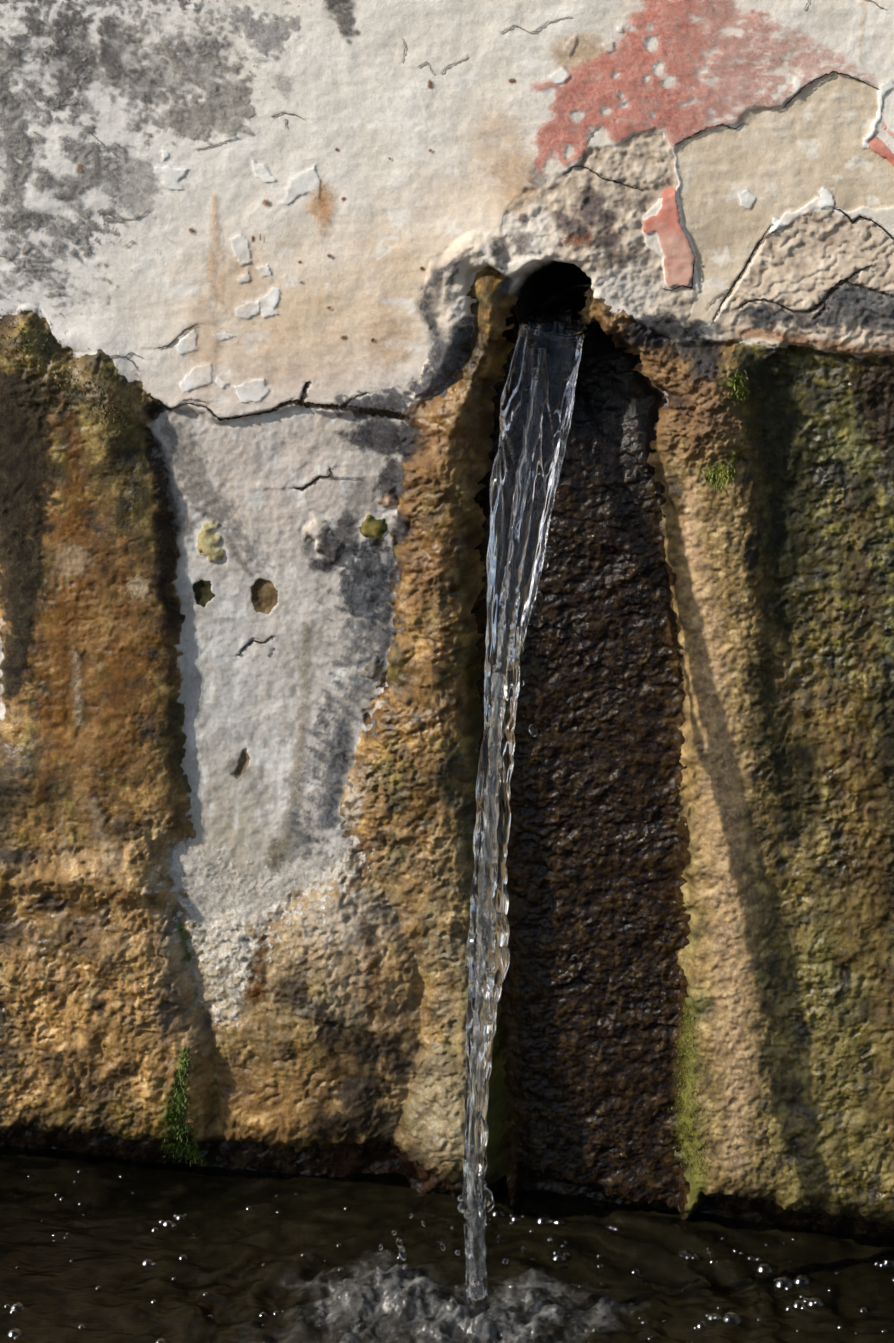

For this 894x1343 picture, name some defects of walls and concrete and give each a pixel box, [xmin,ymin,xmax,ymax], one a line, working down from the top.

mould [326,0,358,43]
mould [0,0,299,323]
peeling [230,234,281,319]
crack [104,324,408,421]
leakage [622,309,721,380]
flaking render [501,0,894,356]
crack [704,224,894,322]
crack [833,207,894,240]
leakage [0,359,70,707]
flaking render [148,328,404,927]
leakage [128,249,475,1026]
leakage [0,930,464,1185]